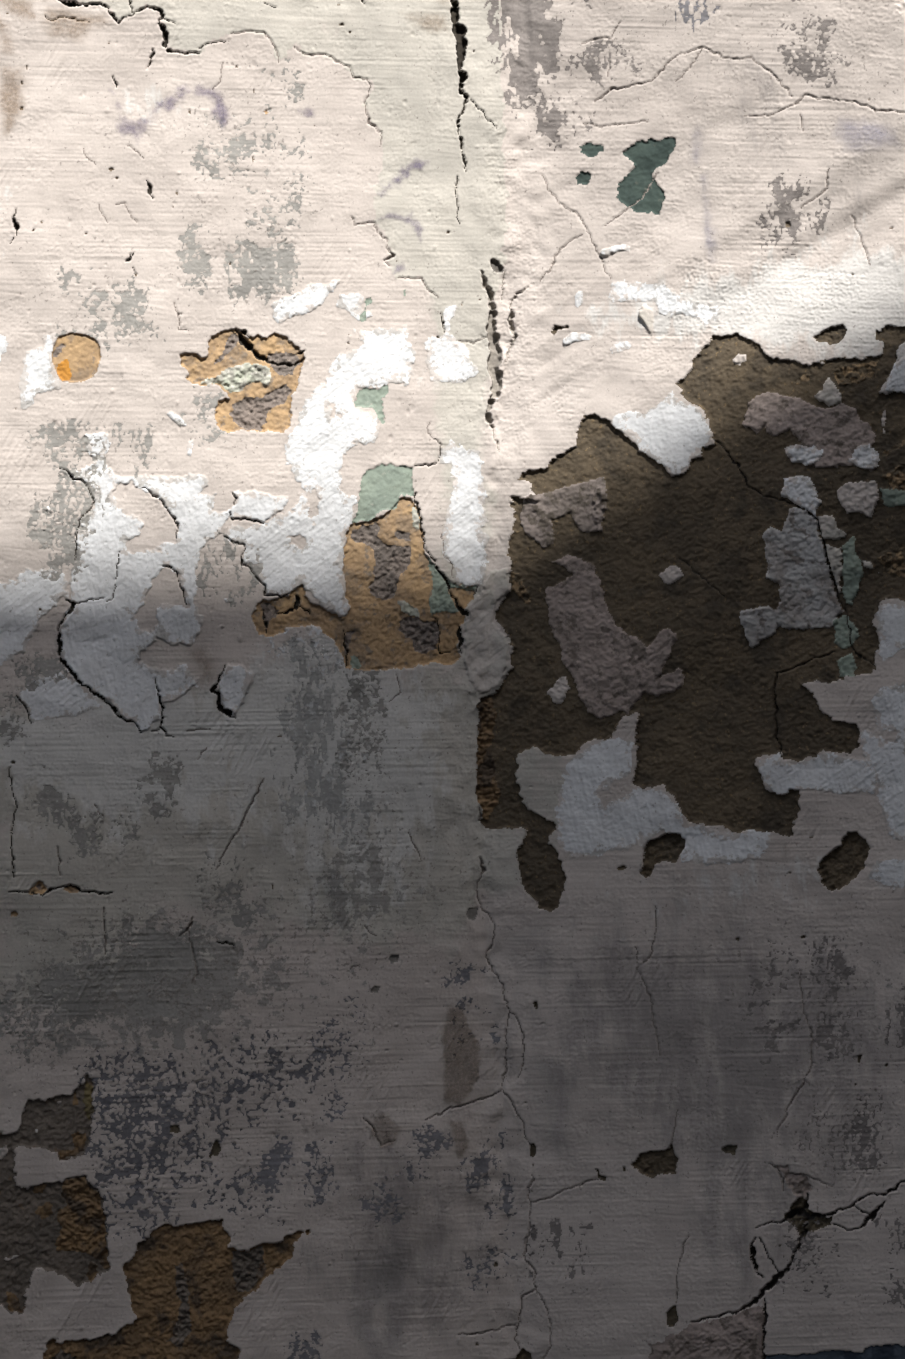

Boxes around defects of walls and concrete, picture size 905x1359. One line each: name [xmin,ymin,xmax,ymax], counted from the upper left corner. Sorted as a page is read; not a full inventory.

crack [45,0,382,147]
crack [450,0,497,224]
crack [59,468,95,560]
crack [142,487,187,605]
spalling [0,58,905,912]
crack [57,551,236,760]
peeling [194,852,273,929]
peeling [0,980,71,1068]
spalling [0,1029,340,1359]
crack [675,970,905,1359]